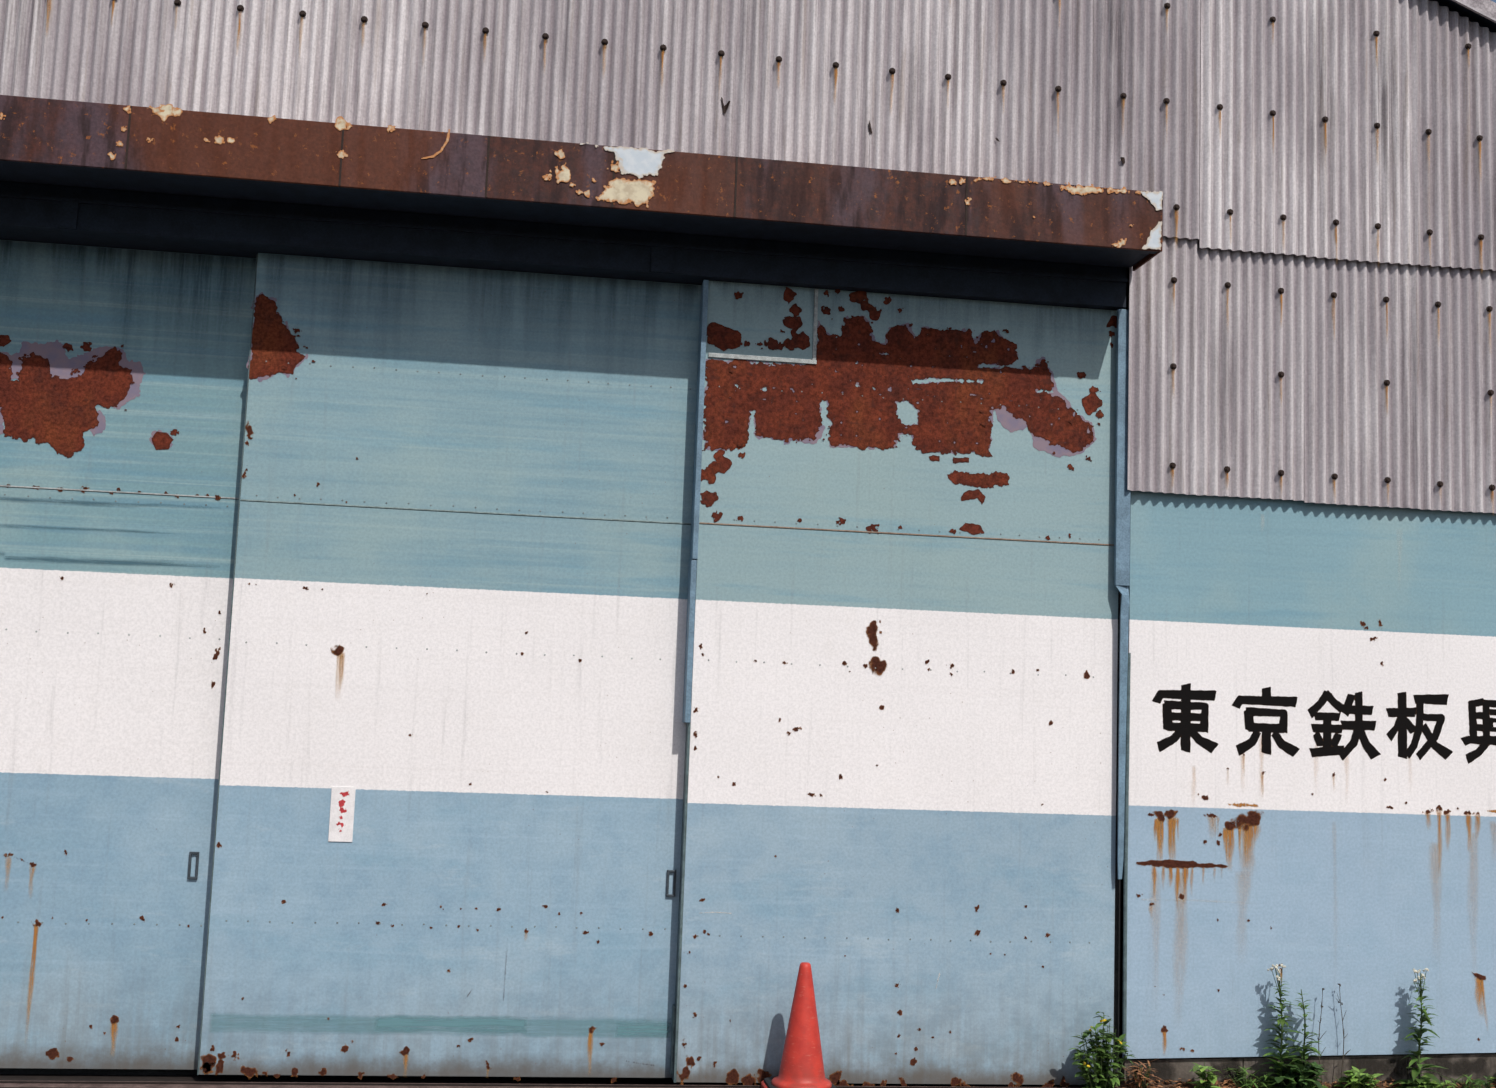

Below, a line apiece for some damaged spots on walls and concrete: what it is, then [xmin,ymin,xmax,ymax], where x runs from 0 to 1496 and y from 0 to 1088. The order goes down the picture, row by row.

peeling [542,142,674,208]
corrosion [842,620,887,675]
corrosion [1386,801,1496,848]
corrosion [1136,793,1261,906]
corrosion [28,917,53,1004]
corrosion [1473,973,1486,1003]
corrosion [200,1045,298,1078]
corrosion [387,1046,410,1080]
corrosion [588,1026,604,1057]